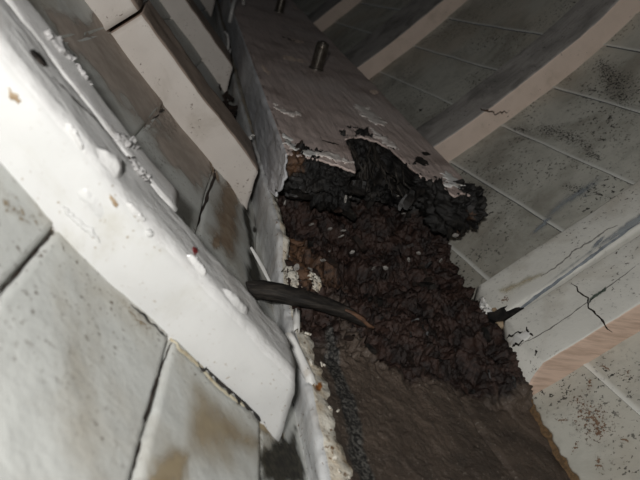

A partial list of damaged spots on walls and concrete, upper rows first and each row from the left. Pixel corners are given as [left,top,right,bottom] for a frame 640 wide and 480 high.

crack [196,169,216,228]
crack [129,305,266,480]
spalling [275,104,571,480]
crack [520,267,634,356]